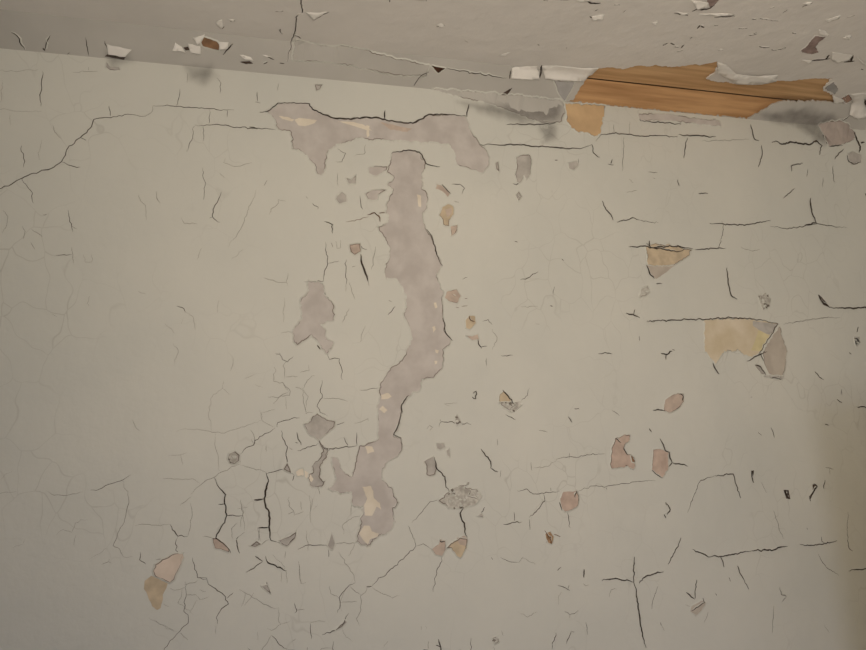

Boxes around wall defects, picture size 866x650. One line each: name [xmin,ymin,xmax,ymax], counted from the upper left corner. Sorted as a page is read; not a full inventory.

flaking render [172,34,232,55]
crack [0,0,470,246]
peeling [431,80,607,138]
crack [312,199,385,319]
crack [427,229,443,266]
peeling [645,242,693,279]
peeling [265,101,500,551]
crack [443,277,510,356]
peeling [703,317,788,380]
peeling [609,433,636,470]
crack [95,355,485,650]
crack [503,394,866,647]